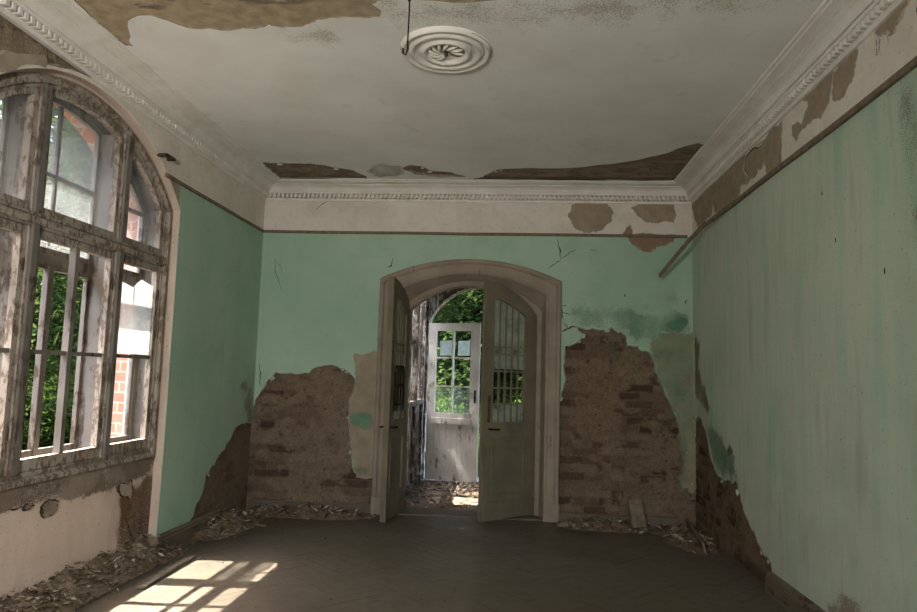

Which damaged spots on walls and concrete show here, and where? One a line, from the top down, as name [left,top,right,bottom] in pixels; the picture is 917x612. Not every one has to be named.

flaking render [0,15,91,84]
flaking render [76,0,381,45]
peeling [875,0,917,55]
flaking render [263,162,367,179]
flaking render [403,165,463,177]
flaking render [474,143,704,181]
peeling [692,48,859,227]
peeling [568,204,614,233]
peeling [623,204,676,253]
flaking render [190,350,377,521]
flaking render [559,327,773,584]
flaking render [0,448,156,519]